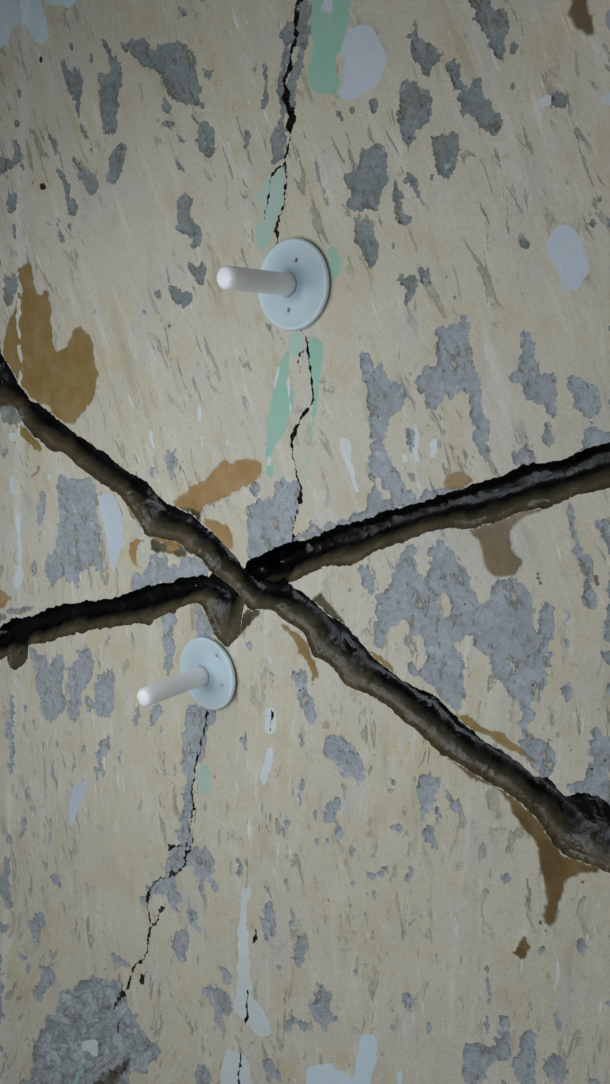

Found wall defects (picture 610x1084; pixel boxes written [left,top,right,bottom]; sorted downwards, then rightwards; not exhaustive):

flaking render [48,37,216,249]
crack [264,0,303,244]
water stain [0,405,41,451]
water stain [0,263,98,423]
water stain [173,459,261,549]
crack [290,330,315,542]
peeling [0,313,610,873]
water stain [470,508,542,576]
crack [113,710,209,1033]
peeling [194,1050,282,1084]
peeling [201,858,276,1036]
flaking render [461,965,570,1084]